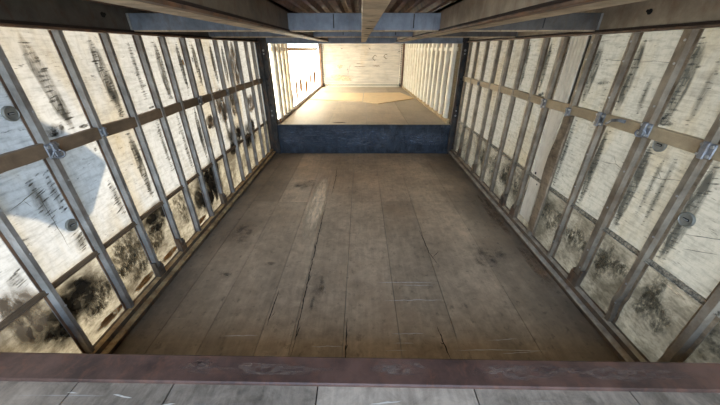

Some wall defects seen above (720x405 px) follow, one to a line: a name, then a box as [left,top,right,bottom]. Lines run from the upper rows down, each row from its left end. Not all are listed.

damp [18,42,86,137]
damp [666,37,705,116]
damp [192,89,256,211]
damp [0,268,73,346]
mould [60,275,111,323]
mould [112,230,148,281]
mould [145,206,165,253]
crack [291,171,337,354]
mould [594,247,626,277]
mould [632,279,669,332]